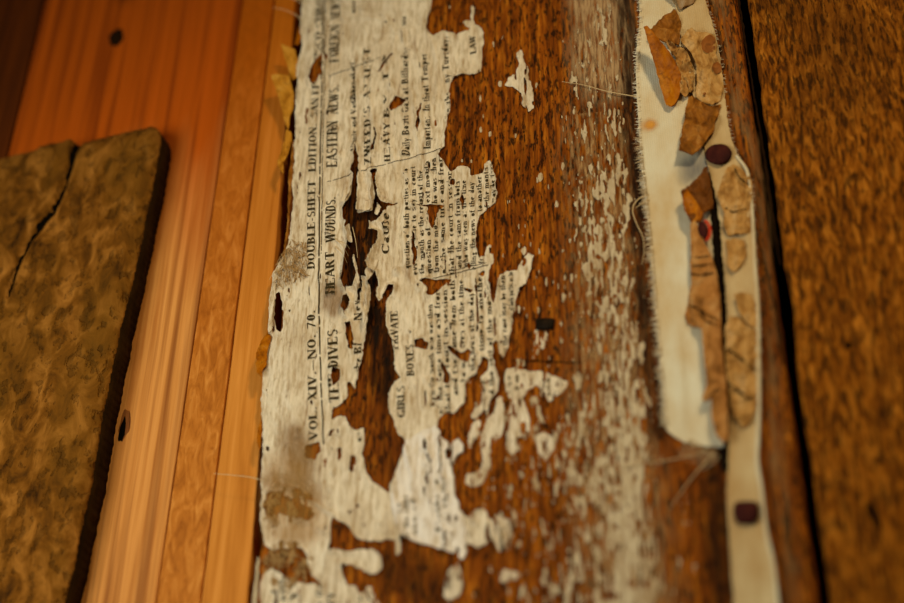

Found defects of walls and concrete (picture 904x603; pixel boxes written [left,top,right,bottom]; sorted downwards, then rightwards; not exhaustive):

crack [8,144,81,297]
peeling [484,1,674,603]